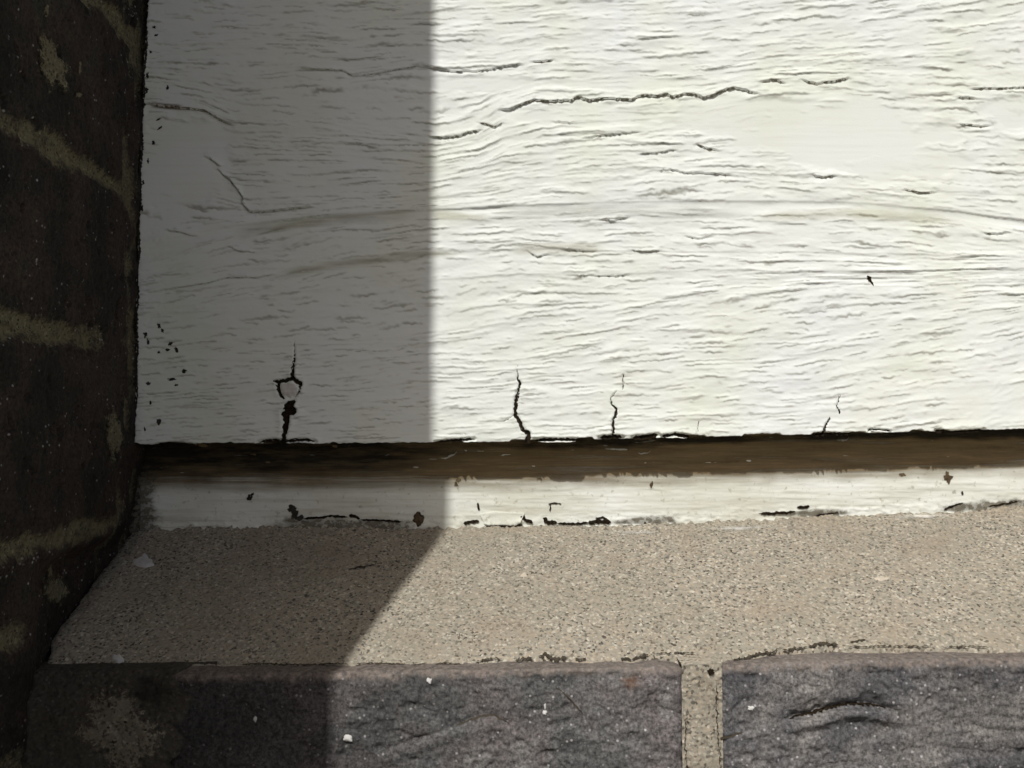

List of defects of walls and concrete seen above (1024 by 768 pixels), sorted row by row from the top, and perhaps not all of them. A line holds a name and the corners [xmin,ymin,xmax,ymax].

crack [432,79,848,139]
crack [273,344,302,441]
crack [510,365,531,444]
crack [610,374,624,437]
leakage [141,442,431,473]
leakage [522,429,1024,448]
peeling [287,504,304,521]
peeling [412,512,424,527]